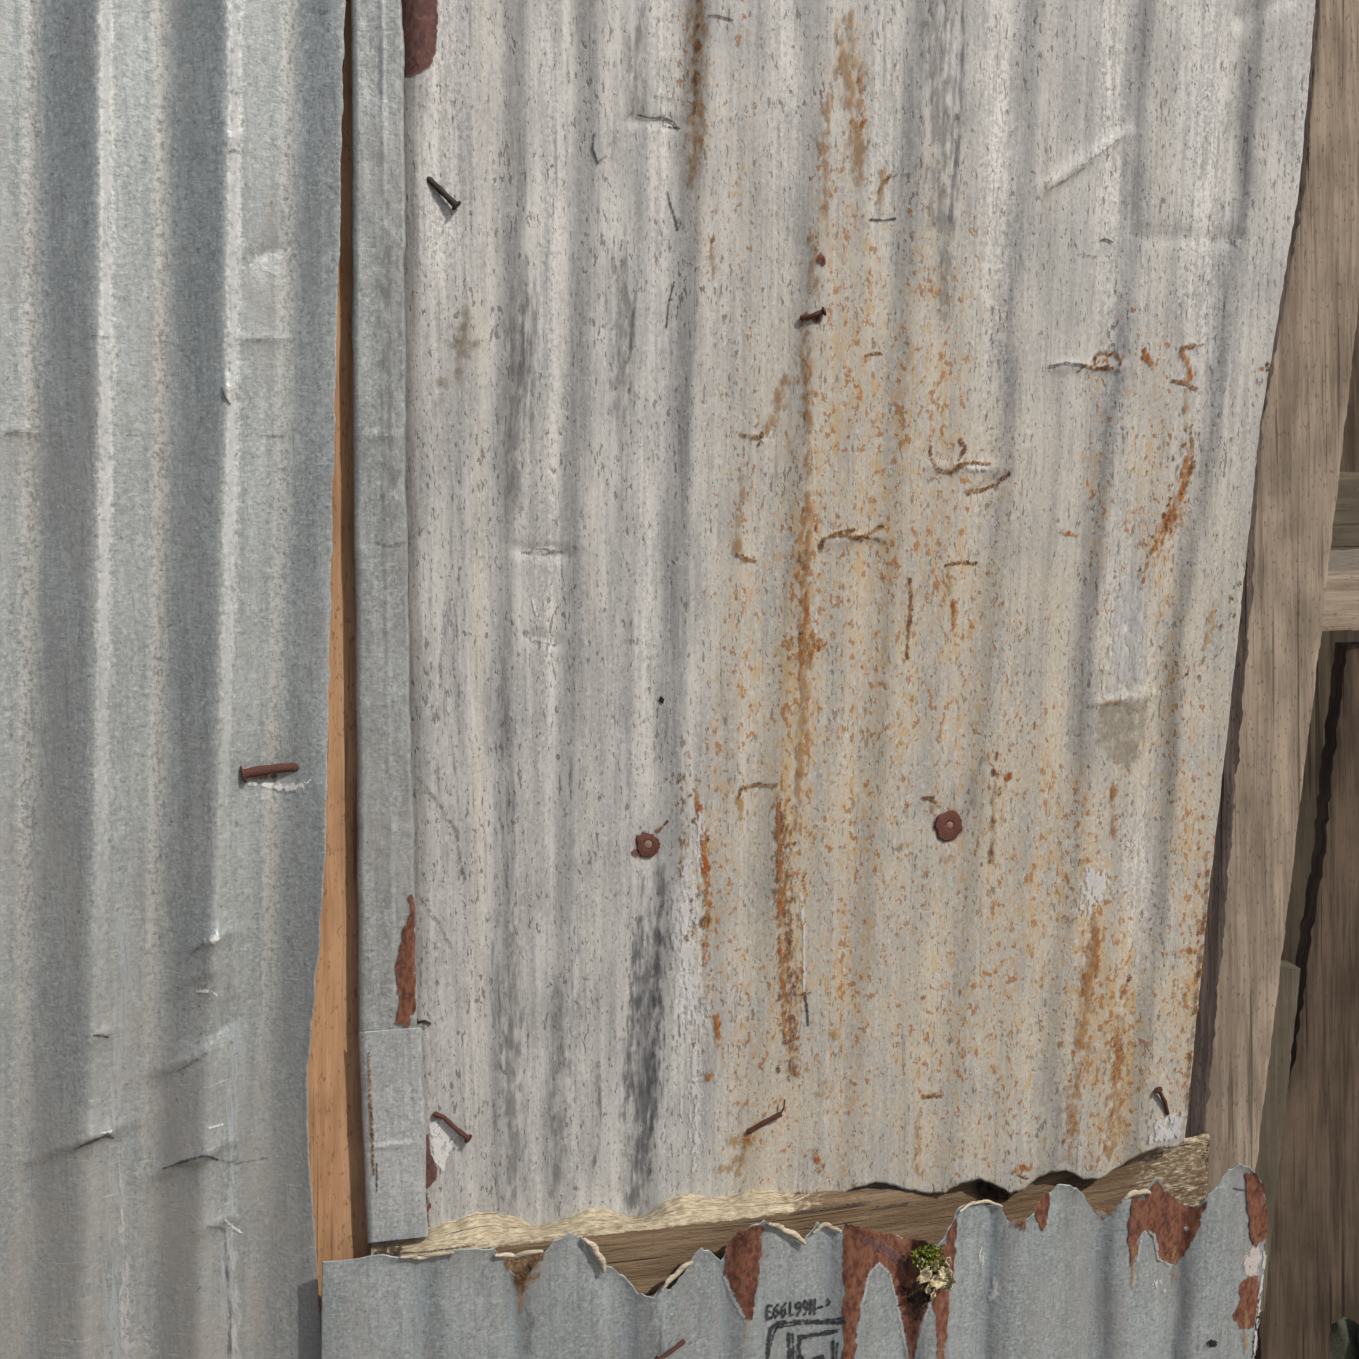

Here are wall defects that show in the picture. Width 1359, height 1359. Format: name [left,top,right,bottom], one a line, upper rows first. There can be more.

rust [401,0,438,76]
rust [817,11,867,212]
rust [1138,343,1205,590]
rust [735,451,827,1079]
rust [394,895,416,1026]
rust [1062,914,1102,1160]
rust [1104,1015,1126,1156]
rust [724,1225,764,1320]
rust [842,1210,959,1359]
rust [1094,1181,1207,1284]
rust [1233,1275,1260,1354]
rust [1233,1173,1269,1248]